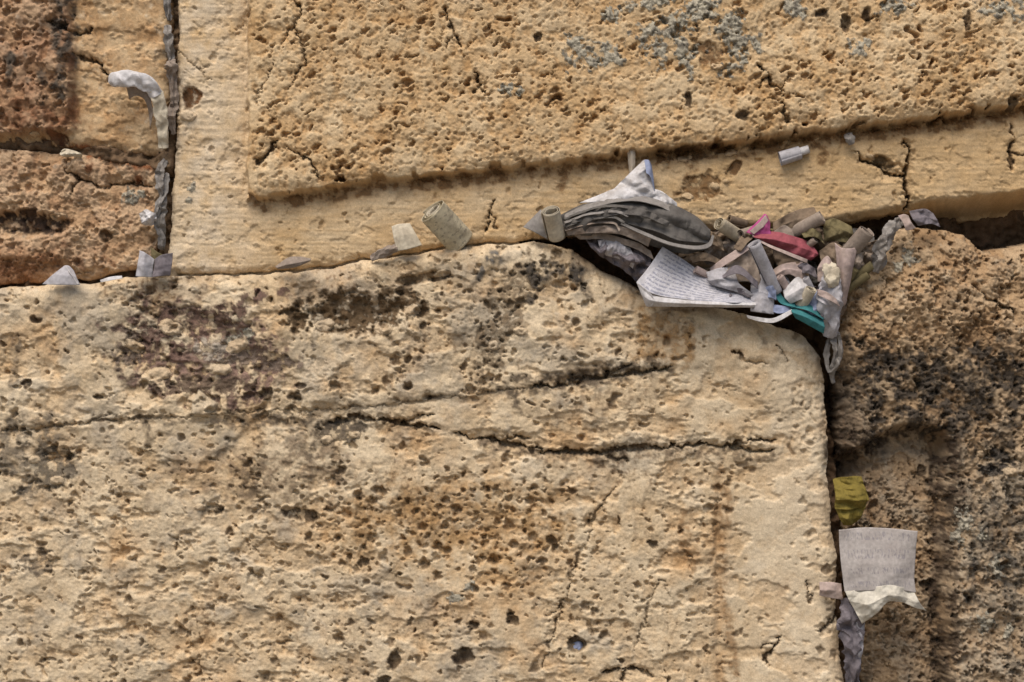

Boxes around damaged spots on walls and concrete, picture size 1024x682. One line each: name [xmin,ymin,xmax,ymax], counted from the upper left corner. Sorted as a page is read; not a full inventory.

crack [256,140,319,178]
crack [1007,125,1019,170]
crack [859,160,909,209]
crack [537,365,657,387]
crack [338,413,776,461]